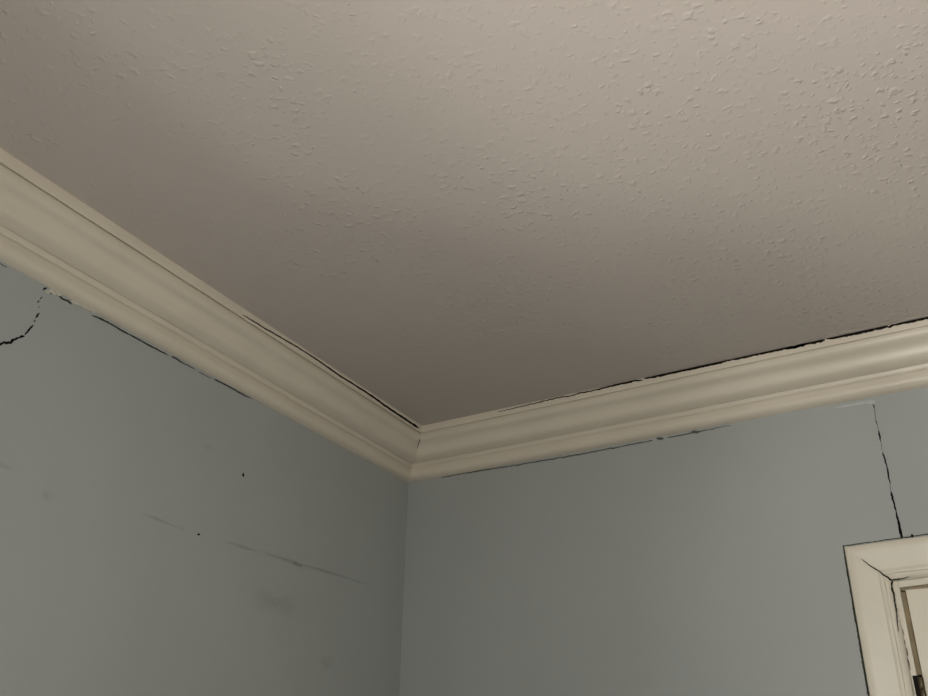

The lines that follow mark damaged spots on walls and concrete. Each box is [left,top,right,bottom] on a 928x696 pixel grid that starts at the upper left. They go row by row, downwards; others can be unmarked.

crack [0,287,72,346]
crack [92,315,252,399]
crack [243,315,420,448]
crack [498,315,928,412]
crack [843,405,928,696]